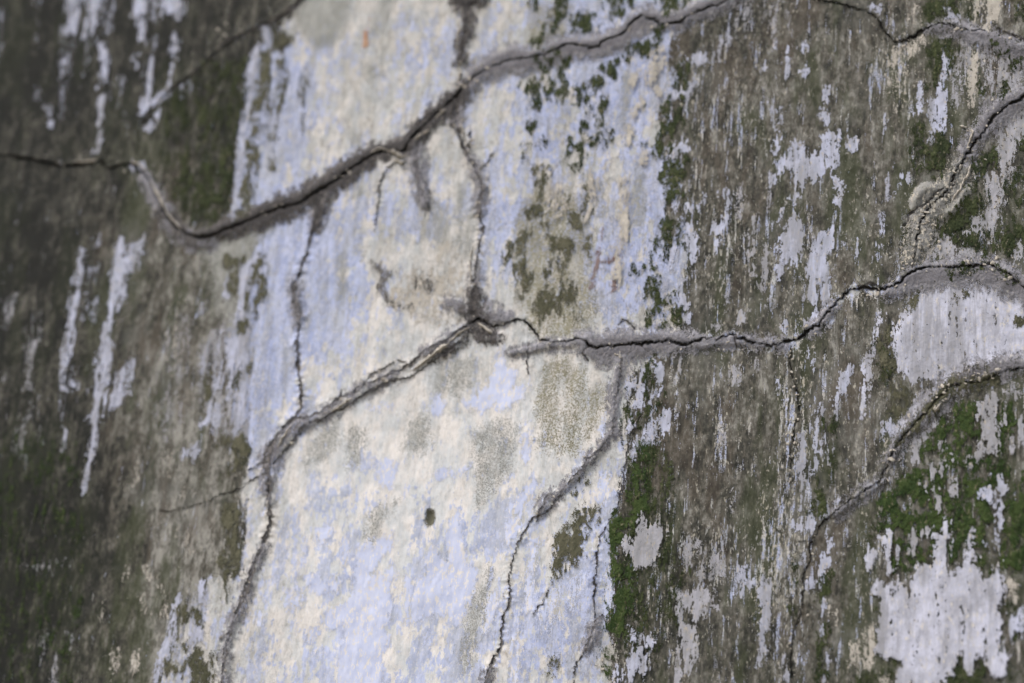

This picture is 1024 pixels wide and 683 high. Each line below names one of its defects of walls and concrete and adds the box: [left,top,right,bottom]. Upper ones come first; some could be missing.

crack [4,0,752,255]
damp [195,215,280,343]
crack [210,83,1024,683]
damp [618,352,676,462]
peeling [788,279,1024,683]